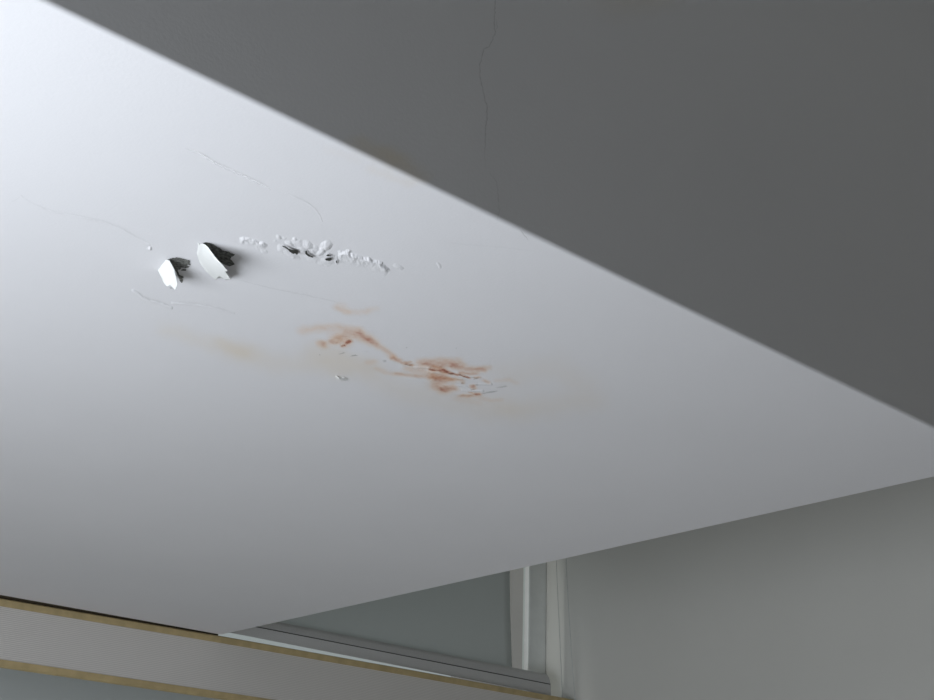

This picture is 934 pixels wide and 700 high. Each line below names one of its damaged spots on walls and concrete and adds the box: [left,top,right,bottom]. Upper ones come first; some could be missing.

peeling [158,242,235,290]